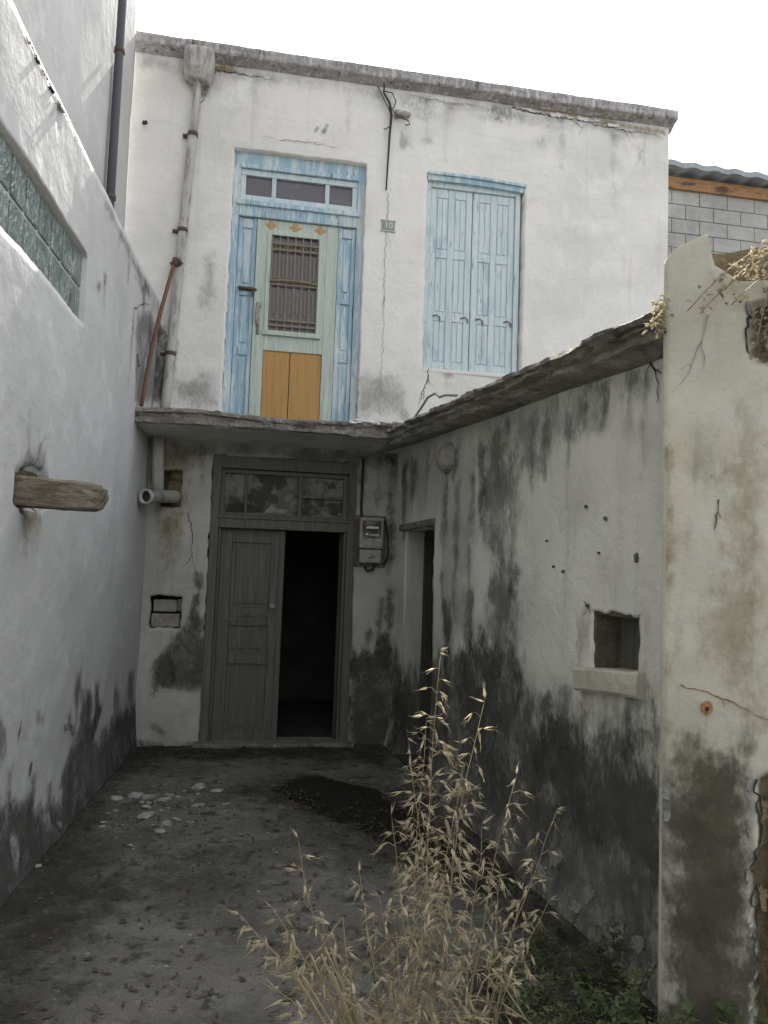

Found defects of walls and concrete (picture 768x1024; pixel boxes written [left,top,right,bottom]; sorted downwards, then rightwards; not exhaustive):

crack [379,195,390,398]
crack [645,315,709,403]
damp [0,681,137,908]
damp [154,577,204,691]
damp [348,530,760,1024]
rust [701,701,713,714]
spalling [746,775,768,1024]